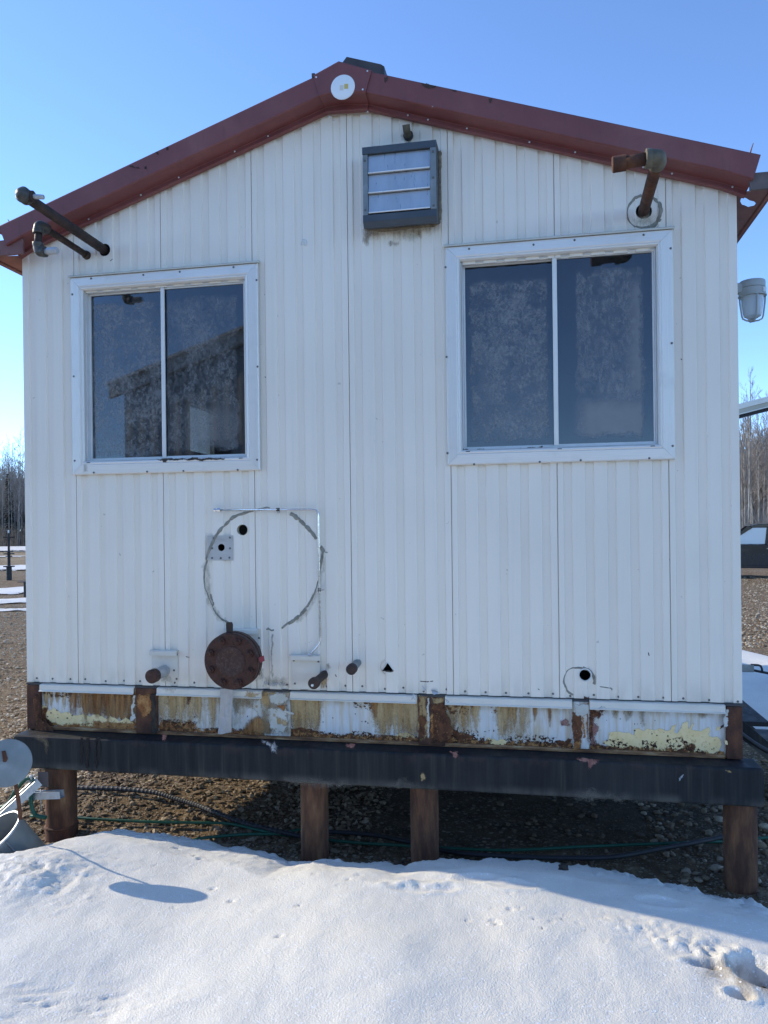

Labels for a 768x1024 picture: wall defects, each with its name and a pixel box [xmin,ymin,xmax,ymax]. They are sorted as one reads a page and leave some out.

peeling [42,695,136,727]
peeling [253,693,294,734]
rust [33,691,725,755]
peeling [603,710,729,754]